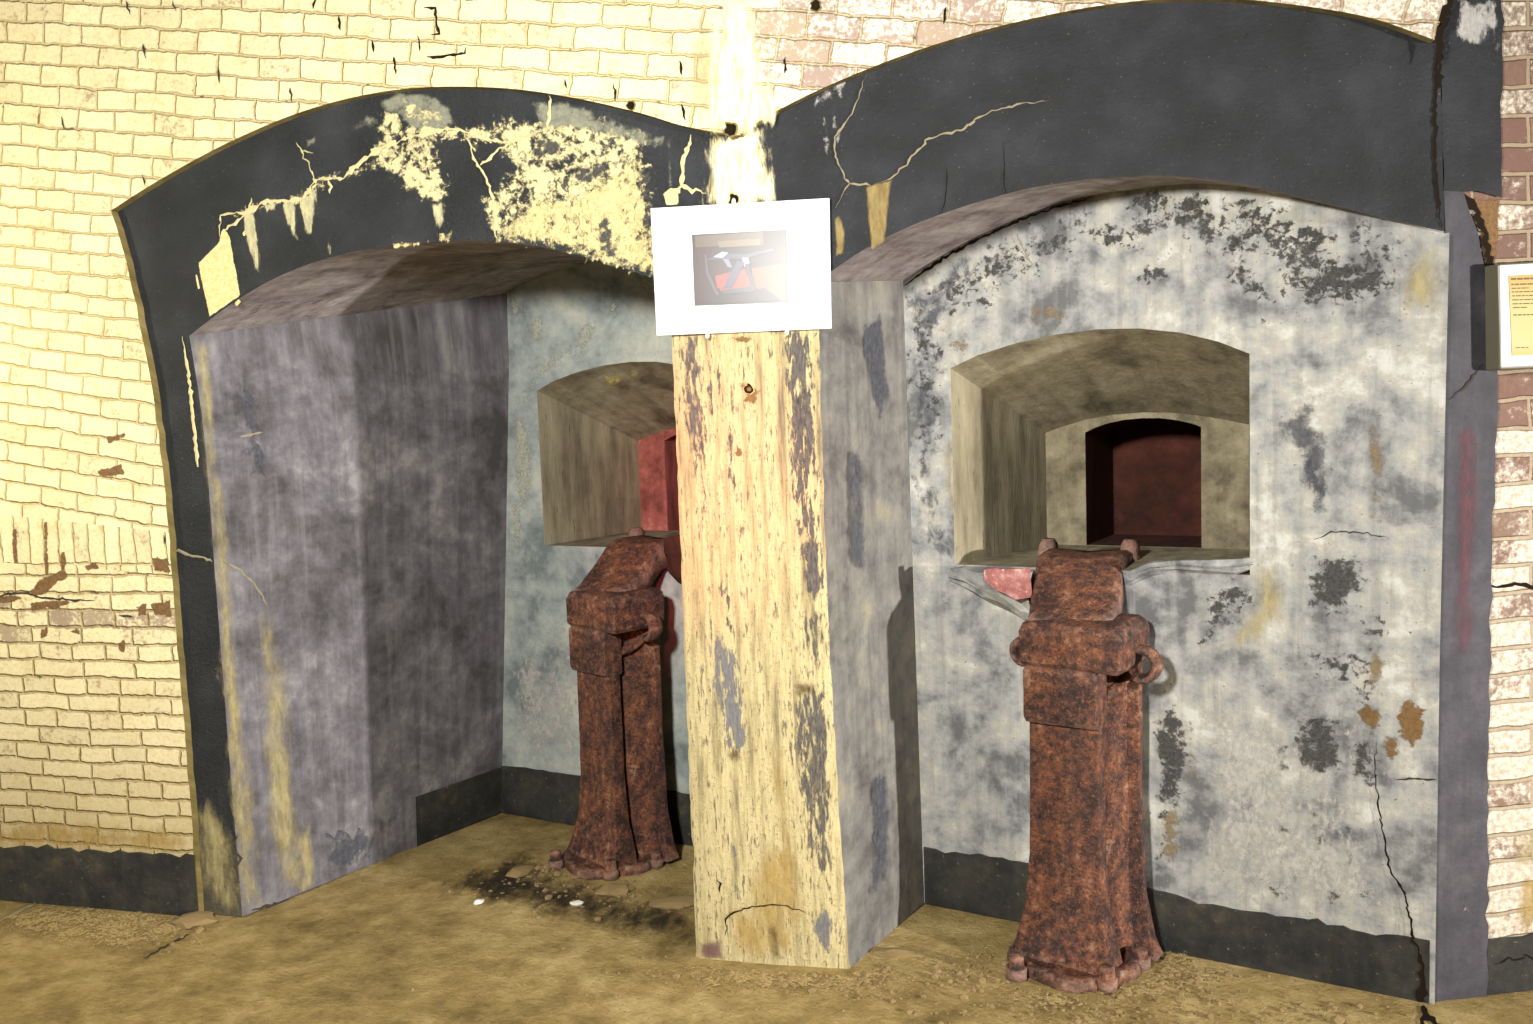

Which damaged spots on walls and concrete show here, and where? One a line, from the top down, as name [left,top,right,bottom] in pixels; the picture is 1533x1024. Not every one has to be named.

damp [700,0,775,204]
crack [833,77,1053,212]
peeling [196,229,246,316]
crack [905,148,1095,285]
damp [907,189,1400,464]
spalling [98,464,125,477]
spalling [0,522,76,611]
spalling [136,600,172,617]
damp [1309,556,1385,700]
crack [1492,582,1533,590]
corrosion [1357,700,1425,759]
crack [1374,742,1438,1024]